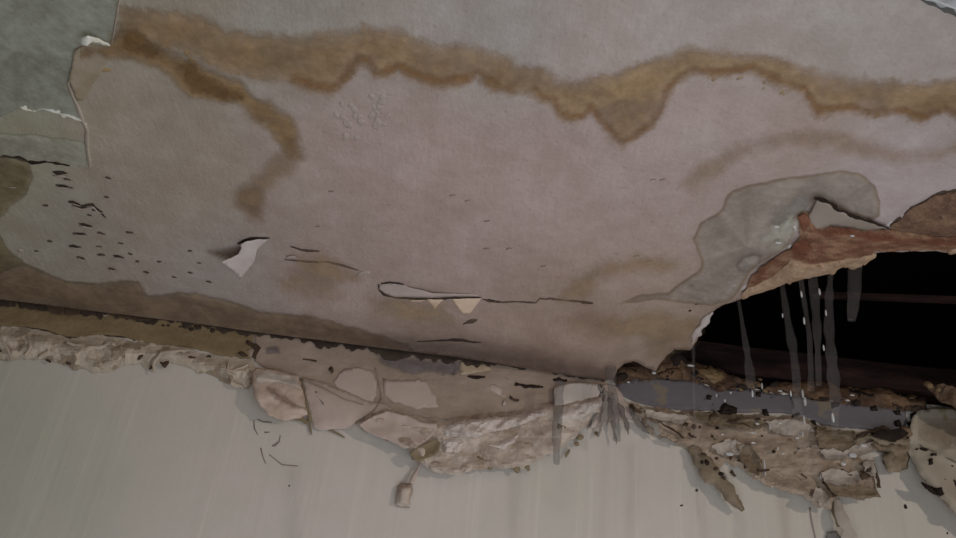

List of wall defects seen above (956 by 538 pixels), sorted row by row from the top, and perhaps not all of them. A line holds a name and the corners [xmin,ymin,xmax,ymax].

peeling [67,0,121,169]
damp [82,9,956,205]
peeling [216,237,270,279]
crack [286,246,359,271]
flaking render [785,189,956,250]
crack [0,282,605,424]
flaking render [0,302,956,420]